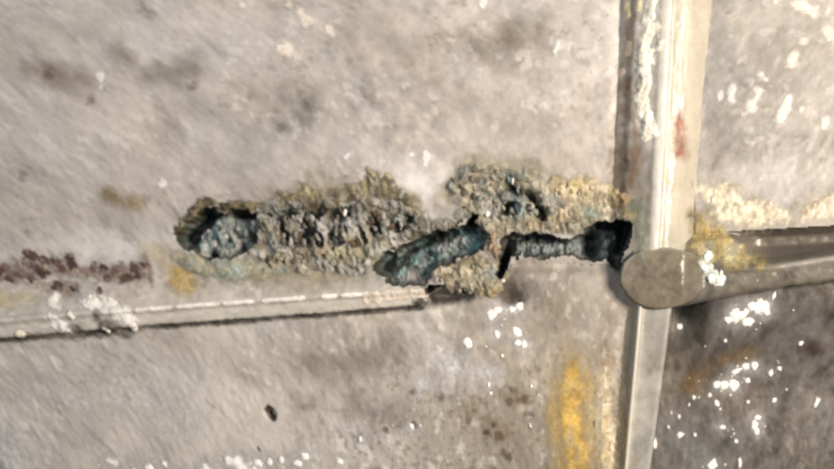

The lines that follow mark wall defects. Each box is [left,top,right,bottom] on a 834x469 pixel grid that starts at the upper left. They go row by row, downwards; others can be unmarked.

corrosion [0,249,161,296]
peeling [179,199,255,252]
peeling [361,288,428,305]
corrosion [171,134,646,298]
peeling [392,219,470,275]
peeling [521,234,616,257]
corrosion [689,210,776,270]
corrosion [549,359,595,469]